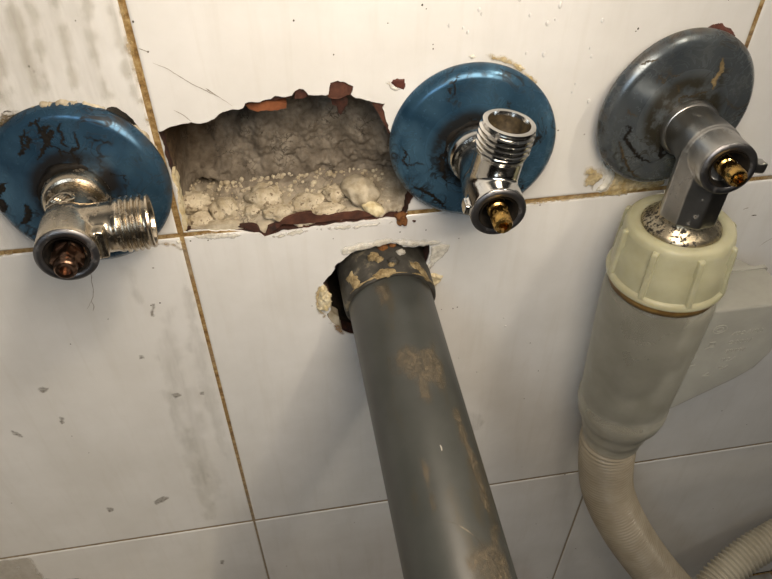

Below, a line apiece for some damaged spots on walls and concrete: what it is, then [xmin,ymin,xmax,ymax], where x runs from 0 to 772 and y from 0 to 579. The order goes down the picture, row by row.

crack [140,49,228,103]
peeling [388,78,405,90]
spalling [164,81,407,239]
spalling [342,240,449,286]
spalling [316,265,351,334]